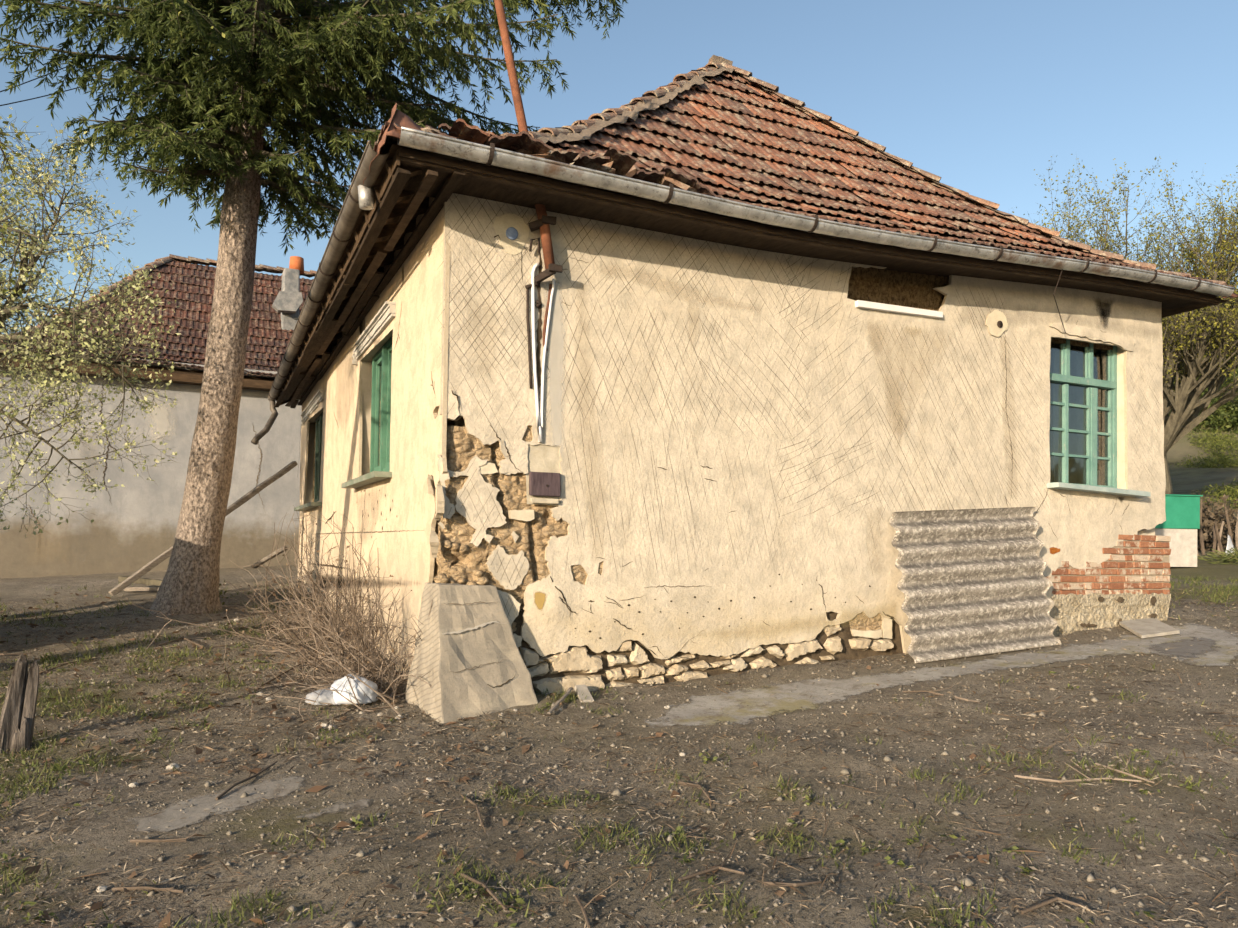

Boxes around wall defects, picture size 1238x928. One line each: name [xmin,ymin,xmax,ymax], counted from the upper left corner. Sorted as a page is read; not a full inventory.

flaking render [427,391,568,647]
flaking render [1044,534,1171,618]